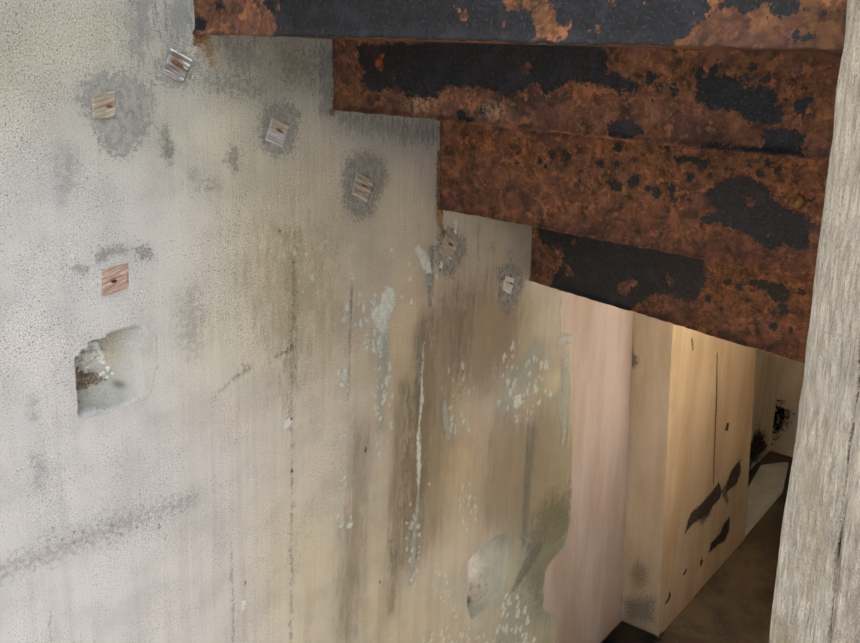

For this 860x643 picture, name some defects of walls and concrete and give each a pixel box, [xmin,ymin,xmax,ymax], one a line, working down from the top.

rust [193,34,215,68]
rust [436,151,445,233]
leakage [407,220,467,282]
leakage [497,263,524,313]
spalling [74,322,158,422]
leakage [341,269,413,460]
leakage [416,342,431,492]
leakage [495,339,553,424]
leakage [749,394,795,472]
leakage [405,502,536,643]
spalling [465,529,511,624]